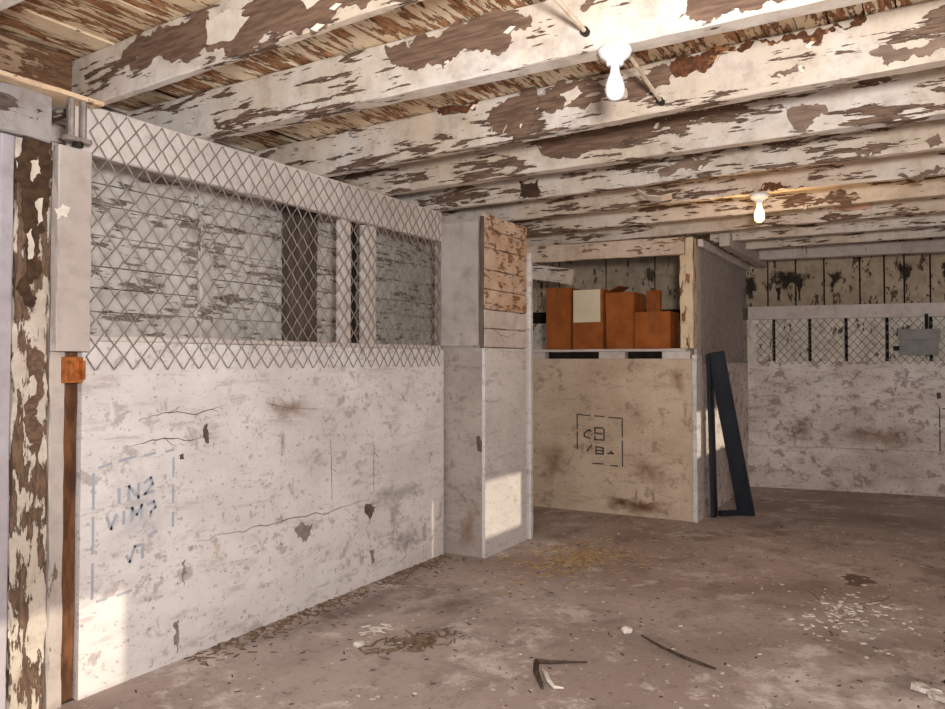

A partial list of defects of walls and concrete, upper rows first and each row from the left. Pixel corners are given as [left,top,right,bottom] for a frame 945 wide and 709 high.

peeling [121,0,377,77]
peeling [384,9,532,71]
peeling [624,14,867,99]
peeling [863,37,945,86]
peeling [487,77,607,135]
peeling [533,104,734,159]
peeling [778,103,830,133]
peeling [13,136,70,307]
damp [743,274,757,299]
damp [773,271,809,301]
damp [897,264,912,293]
peeling [23,346,45,456]